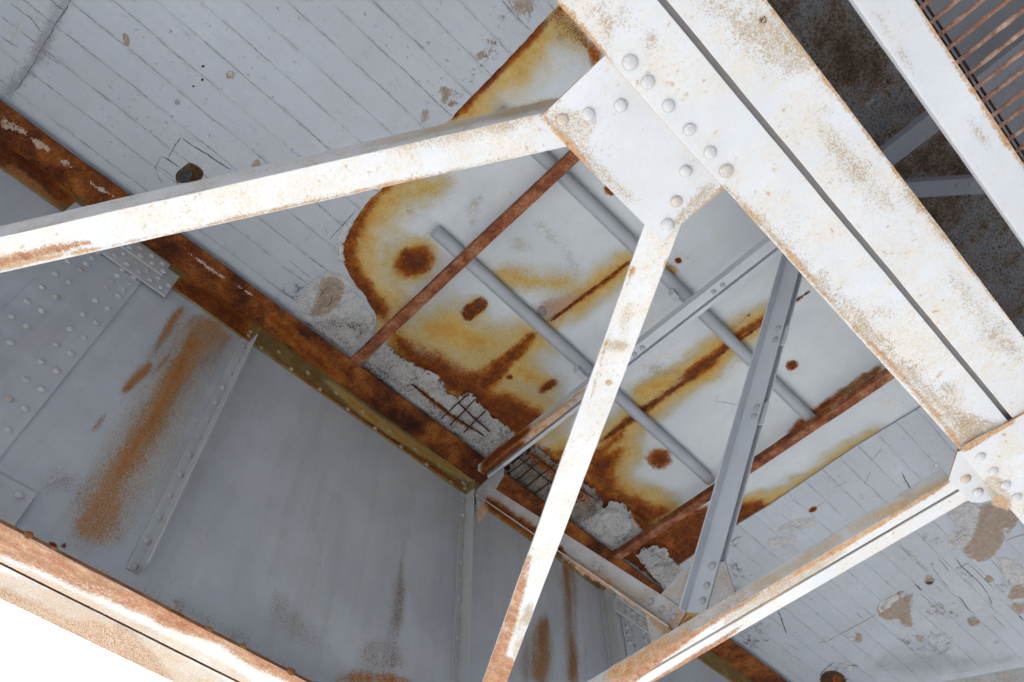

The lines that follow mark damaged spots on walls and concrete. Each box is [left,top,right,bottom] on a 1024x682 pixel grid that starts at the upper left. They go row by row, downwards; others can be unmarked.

corrosion [356,0,659,205]
corrosion [0,156,635,488]
spalling [276,221,376,354]
corrosion [663,257,683,276]
corrosion [672,180,1015,452]
corrosion [0,524,307,682]
spalling [361,341,515,457]
spalling [504,445,559,502]
spalling [569,482,646,550]
spalling [636,545,681,588]
corrosion [583,295,769,600]
peeling [876,502,1024,650]